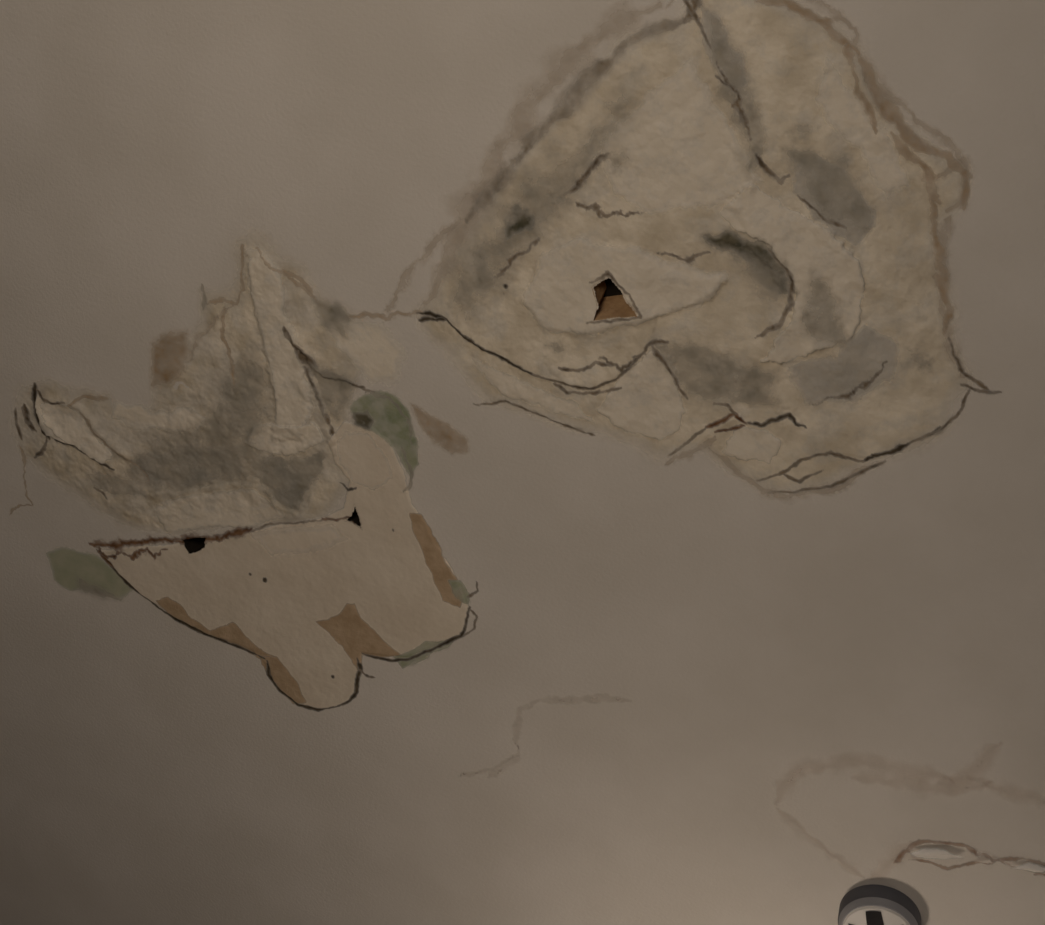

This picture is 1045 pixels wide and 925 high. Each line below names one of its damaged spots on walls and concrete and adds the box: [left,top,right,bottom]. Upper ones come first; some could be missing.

spalling [587,271,642,324]
peeling [47,391,469,708]